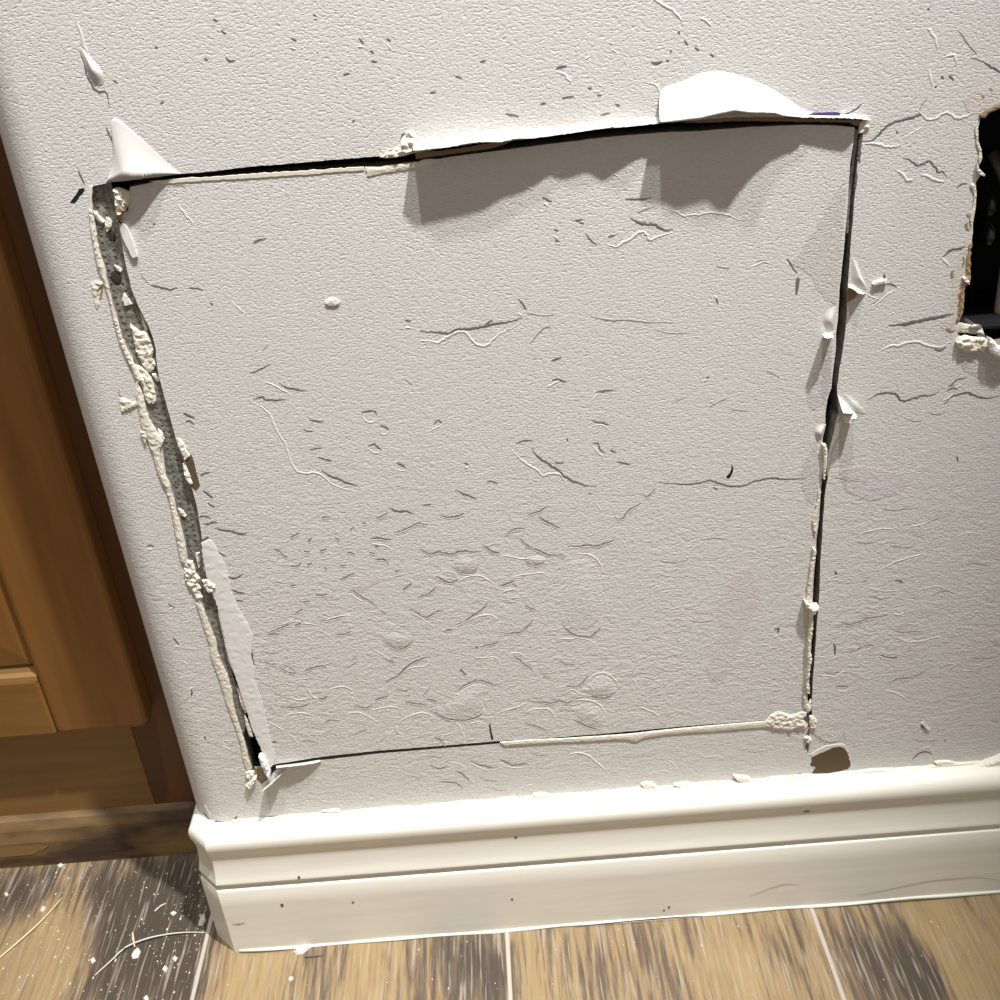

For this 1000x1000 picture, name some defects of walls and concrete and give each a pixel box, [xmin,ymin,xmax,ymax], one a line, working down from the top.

peeling [412,70,868,151]
peeling [106,117,179,183]
crack [854,97,928,190]
crack [903,157,967,187]
peeling [848,279,887,295]
crack [421,299,551,344]
crack [889,313,954,326]
peeling [119,397,138,412]
crack [250,344,306,401]
crack [868,378,1000,421]
crack [516,439,592,494]
crack [251,475,869,790]